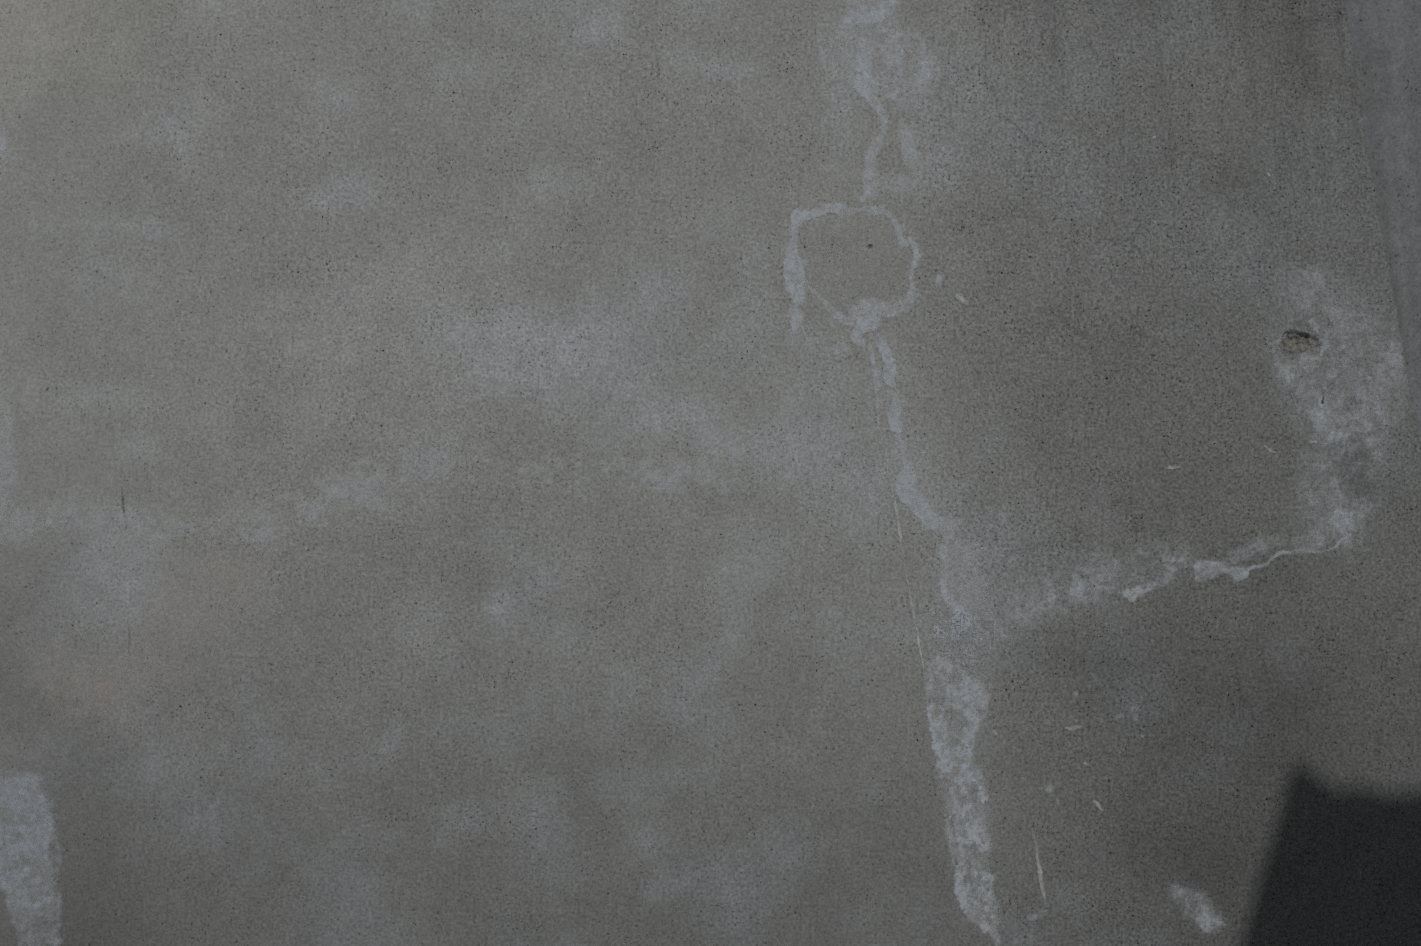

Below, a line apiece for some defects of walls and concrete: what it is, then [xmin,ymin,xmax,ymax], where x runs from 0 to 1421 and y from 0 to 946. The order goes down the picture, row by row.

water stain [1279,343,1401,453]
water stain [783,0,1367,941]
water stain [0,776,52,914]